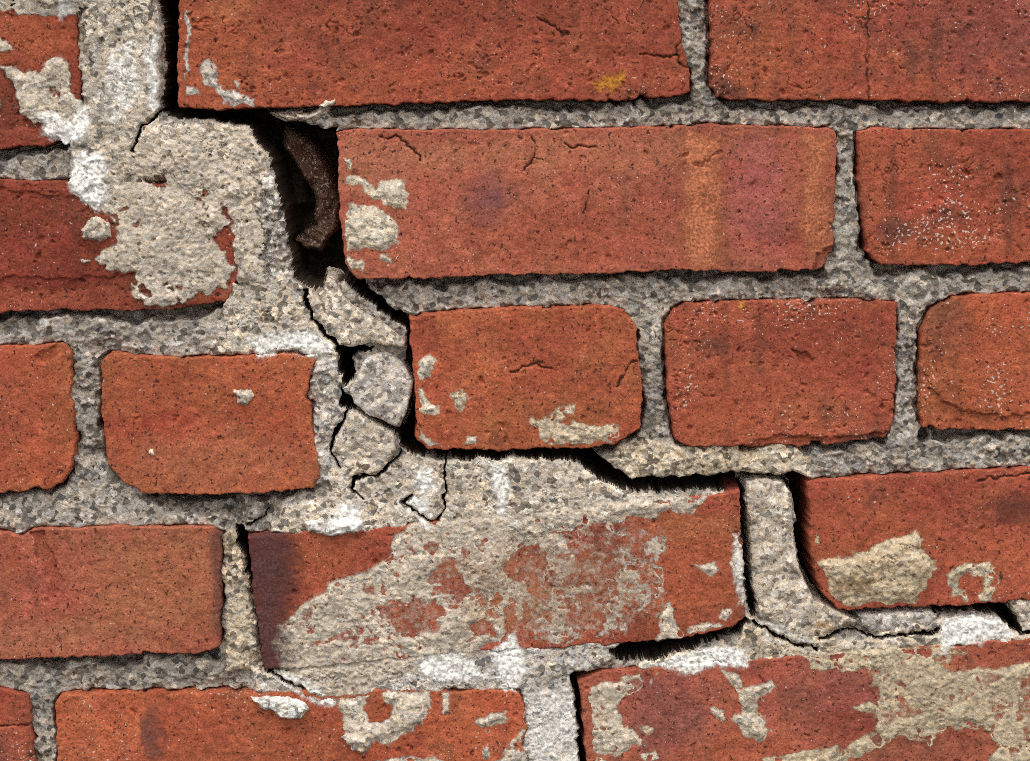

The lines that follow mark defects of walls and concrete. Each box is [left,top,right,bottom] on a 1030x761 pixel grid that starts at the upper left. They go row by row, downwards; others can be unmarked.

peeling [0,57,88,133]
peeling [186,58,254,107]
spalling [0,273,187,313]
crack [130,0,747,522]
crack [783,471,809,493]
crack [236,507,270,588]
peeling [519,493,708,559]
peeling [655,601,732,641]
crack [609,564,1030,662]
crack [267,668,304,689]
crack [569,672,584,761]
peeling [588,673,658,761]